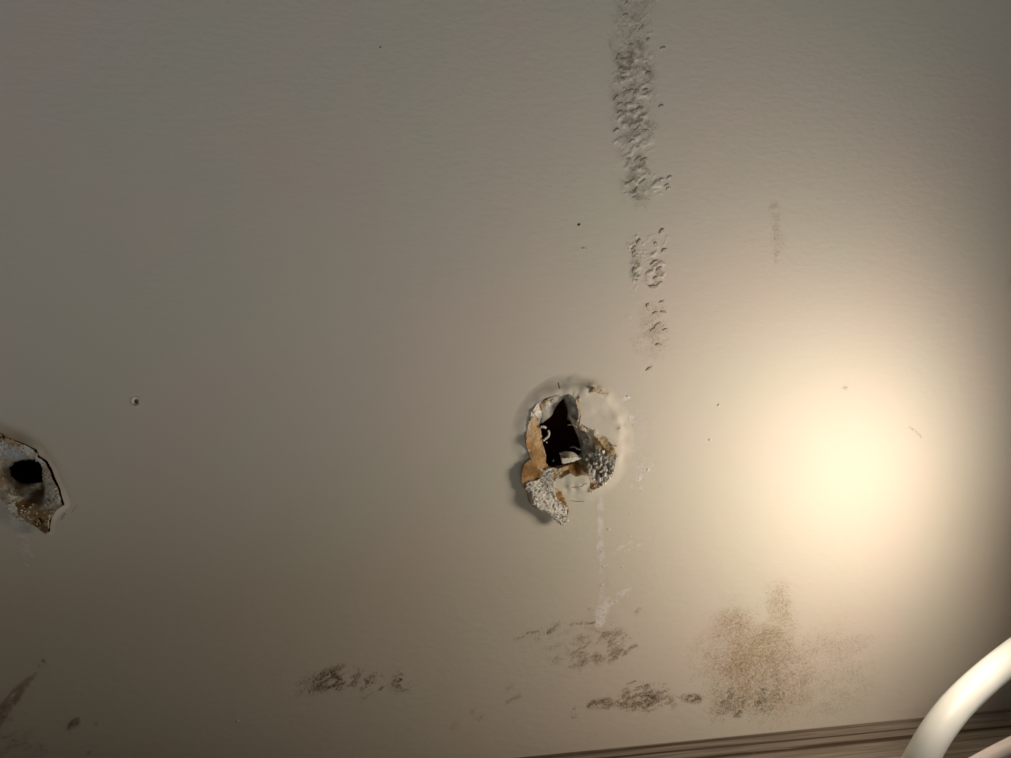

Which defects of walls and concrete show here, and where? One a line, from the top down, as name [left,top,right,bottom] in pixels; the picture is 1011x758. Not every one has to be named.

peeling [606,0,672,213]
peeling [625,229,672,291]
spalling [559,451,581,464]